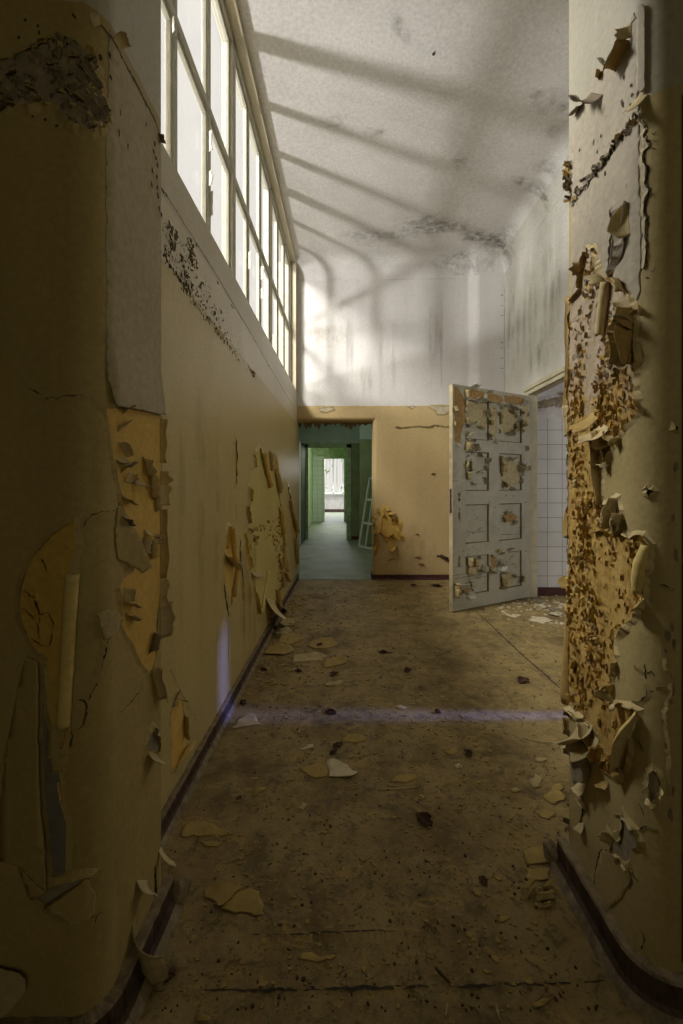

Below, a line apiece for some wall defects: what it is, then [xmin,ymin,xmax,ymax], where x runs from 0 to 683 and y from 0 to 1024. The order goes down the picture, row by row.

spalling [0,18,113,140]
peeling [161,218,264,385]
peeling [407,13,676,844]
peeling [97,402,197,776]
peeling [221,432,300,627]
peeling [372,505,419,561]
peeling [522,846,556,908]
peeling [592,805,646,909]